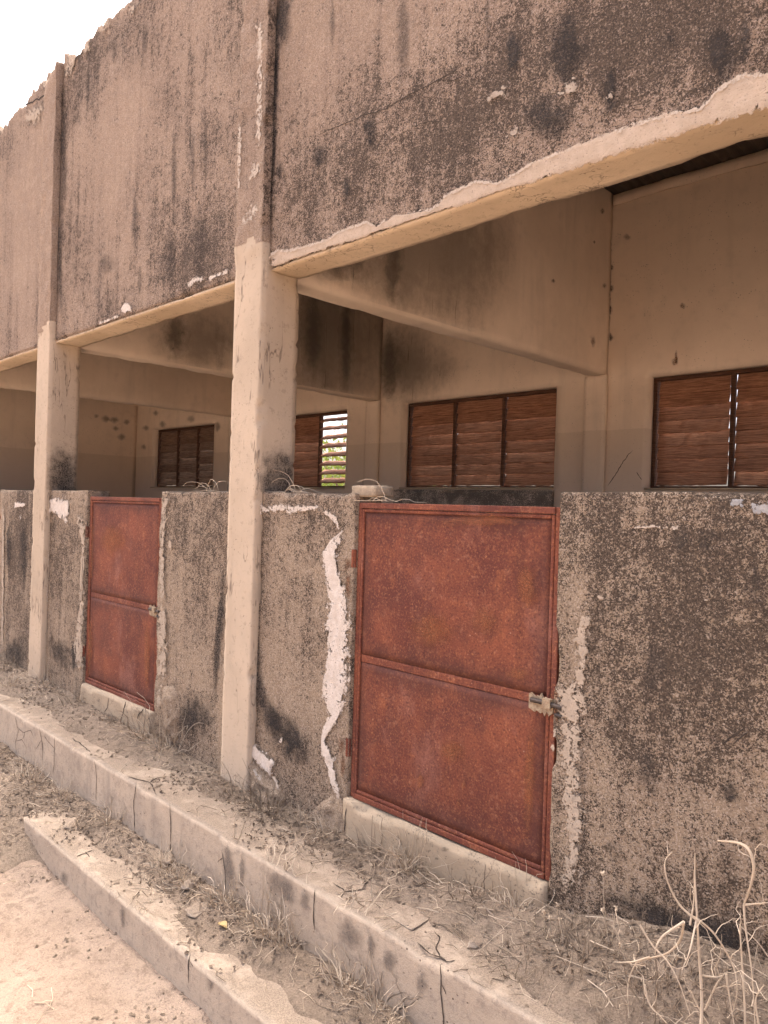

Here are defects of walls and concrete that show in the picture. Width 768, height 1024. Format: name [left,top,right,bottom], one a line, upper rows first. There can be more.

water stain [270,0,289,218]
crack [317,66,462,136]
flaking render [269,71,768,266]
flaking render [49,497,86,674]
flaking render [252,744,281,789]
water stain [256,648,306,760]
flaking render [260,504,352,798]
flaking render [550,595,607,890]